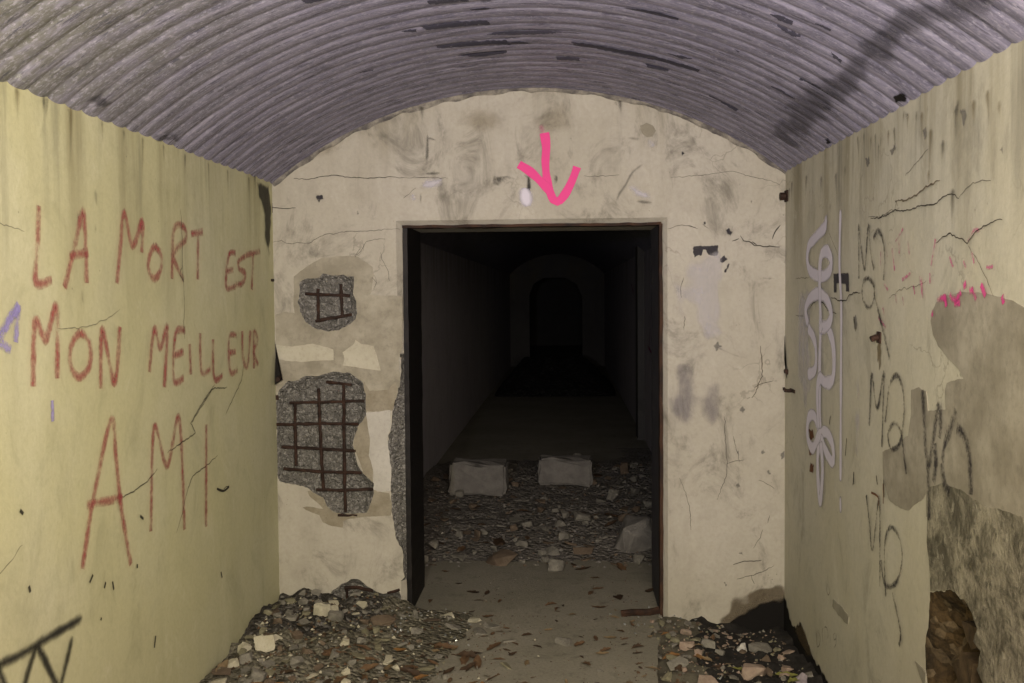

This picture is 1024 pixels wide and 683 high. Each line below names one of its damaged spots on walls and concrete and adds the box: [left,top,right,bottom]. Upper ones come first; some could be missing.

spalling [275,256,407,599]
crack [871,149,991,219]
peeling [883,292,1024,683]
crack [938,219,1002,295]